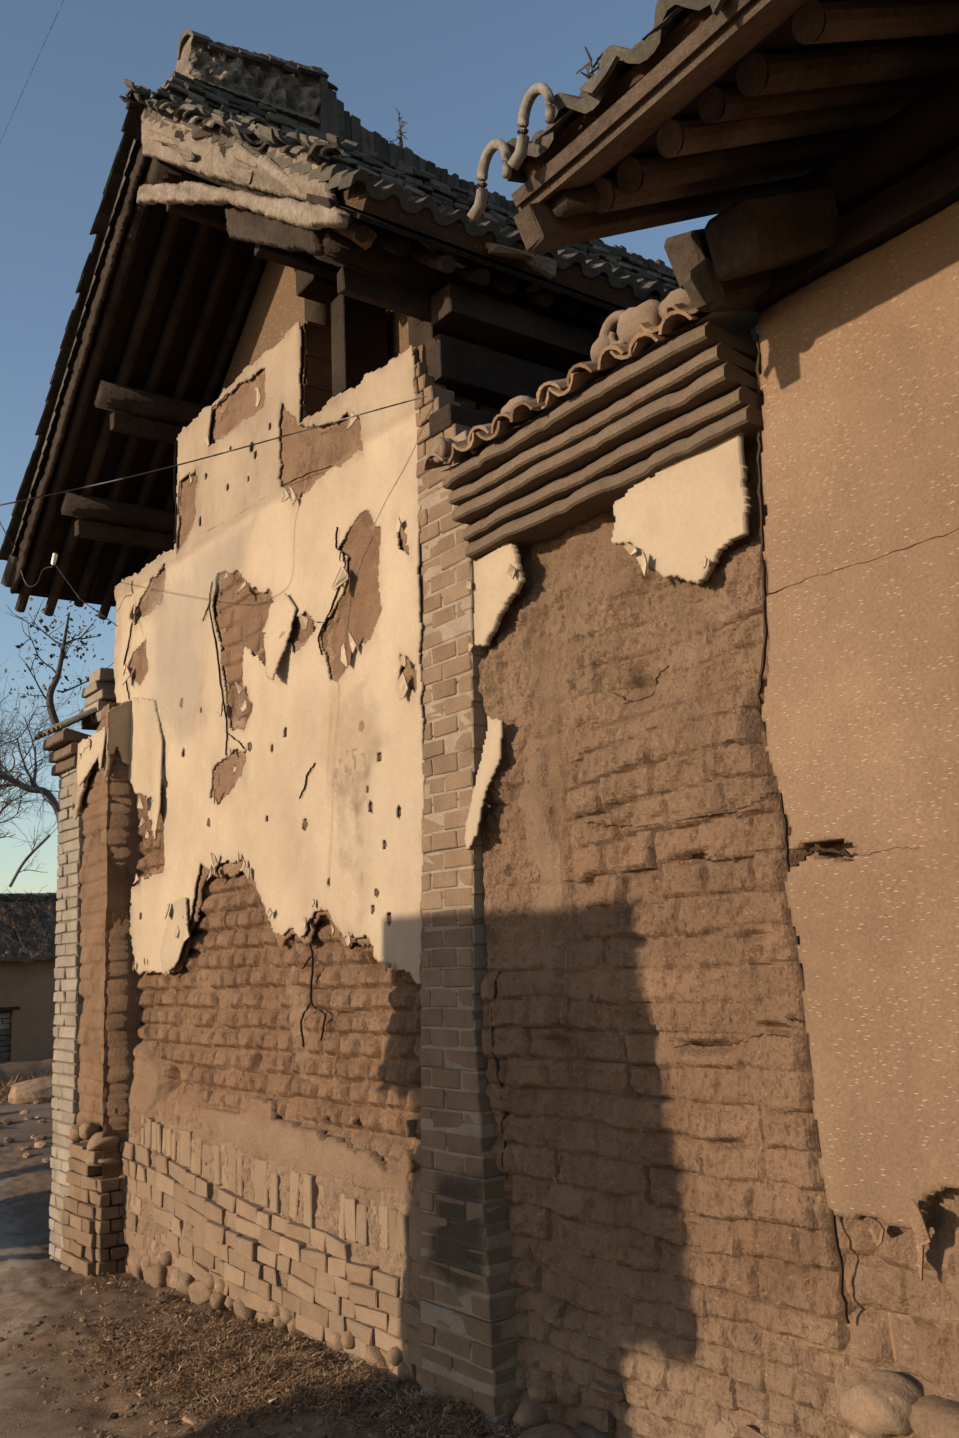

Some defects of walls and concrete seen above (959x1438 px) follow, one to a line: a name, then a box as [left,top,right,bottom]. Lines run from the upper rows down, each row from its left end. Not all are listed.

spalling [205,369,266,447]
spalling [280,405,363,505]
flaking render [466,542,526,655]
flaking render [611,432,751,585]
crack [755,336,958,738]
spalling [208,510,409,826]
flaking render [464,715,503,850]
crack [779,793,920,872]
flaking render [133,897,190,974]
crack [673,909,822,1158]
crack [830,1209,850,1324]
spalling [822,1188,959,1438]